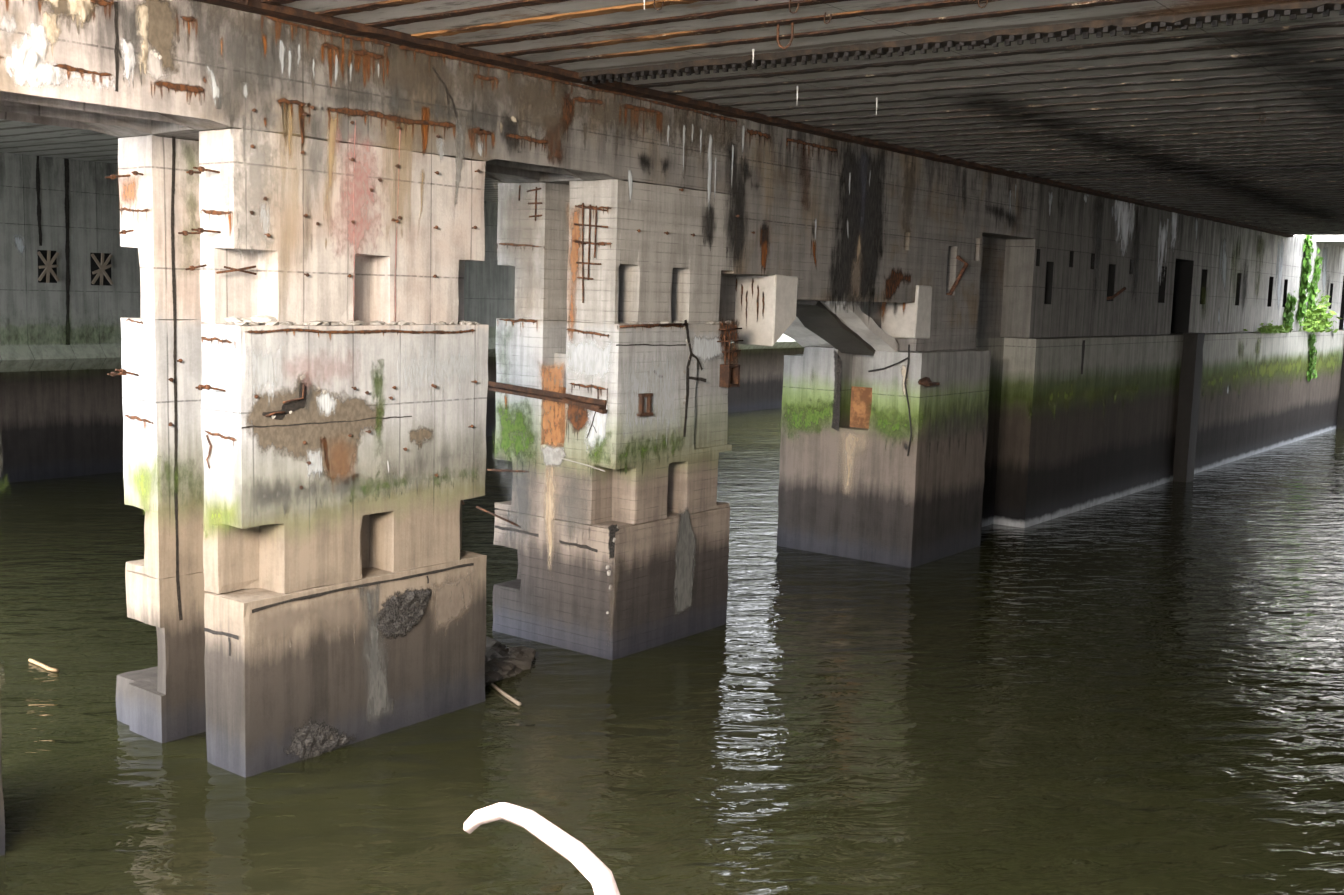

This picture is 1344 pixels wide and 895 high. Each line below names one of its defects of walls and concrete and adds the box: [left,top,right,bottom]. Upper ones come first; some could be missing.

damp [1,0,149,89]
corrosion [90,0,113,18]
corrosion [177,16,197,37]
corrosion [277,98,306,148]
corrosion [327,107,549,156]
corrosion [562,93,603,140]
damp [827,142,886,318]
corrosion [567,205,618,339]
peeling [247,374,384,480]
corrosion [541,364,608,447]
spalling [376,574,472,639]